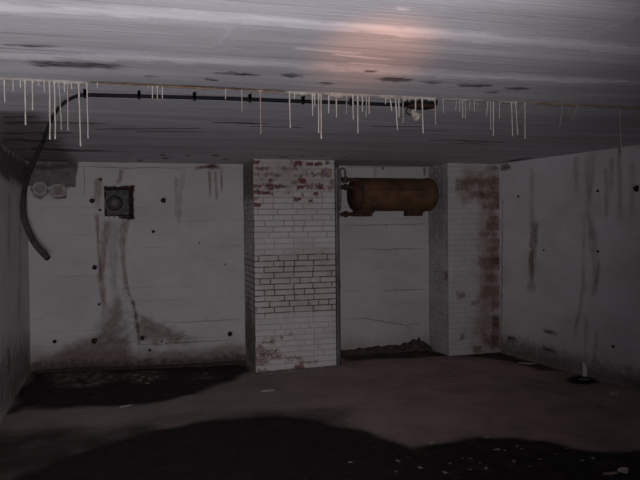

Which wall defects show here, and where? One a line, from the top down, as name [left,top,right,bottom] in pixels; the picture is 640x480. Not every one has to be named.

water stain [0,77,99,162]
water stain [283,91,640,143]
peeling [253,155,333,202]